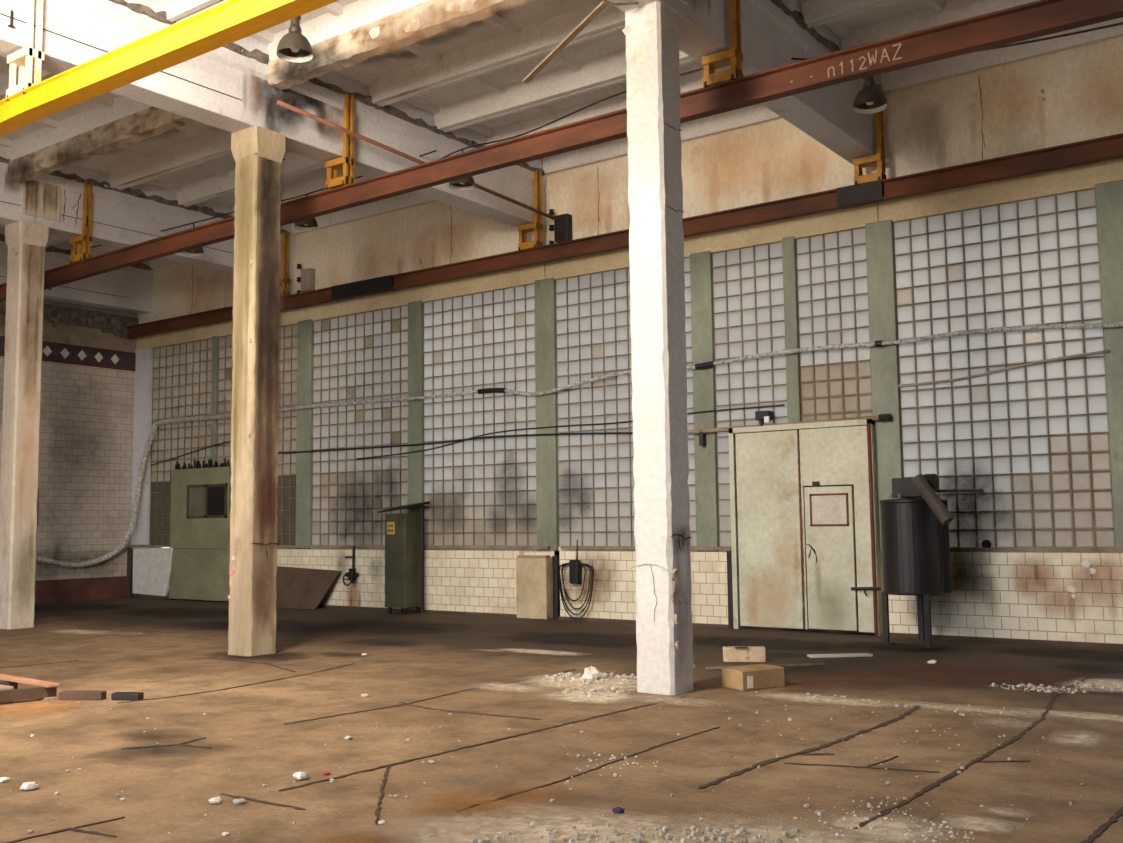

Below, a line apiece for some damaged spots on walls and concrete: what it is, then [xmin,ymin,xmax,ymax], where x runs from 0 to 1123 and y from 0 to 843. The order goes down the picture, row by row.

peeling [445,0,476,11]
peeling [404,19,422,33]
water stain [6,161,50,203]
spalling [28,303,139,338]